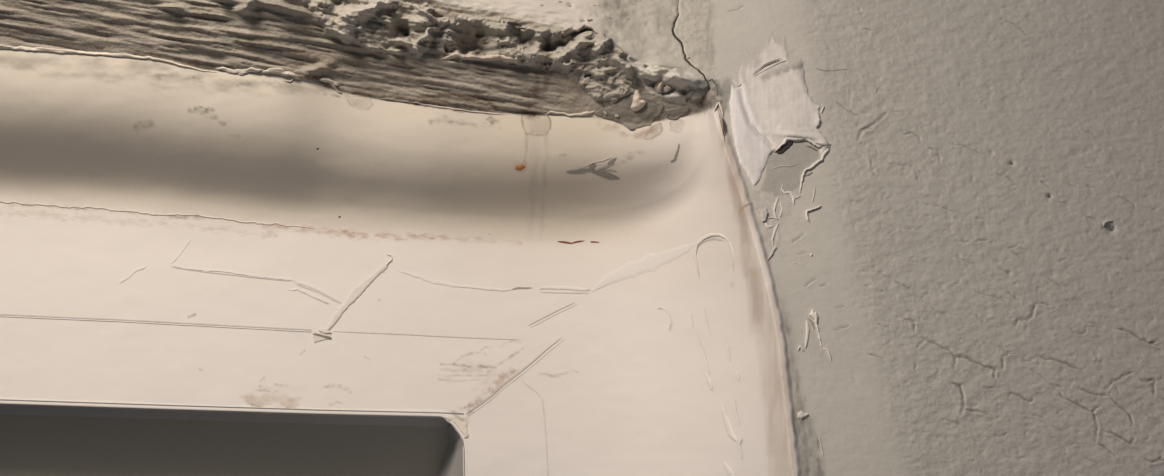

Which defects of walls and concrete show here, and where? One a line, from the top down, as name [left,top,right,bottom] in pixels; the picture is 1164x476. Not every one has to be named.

spalling [299,0,711,131]
crack [672,0,718,96]
peeling [714,102,726,142]
crack [836,88,1135,228]
crack [880,239,1164,464]